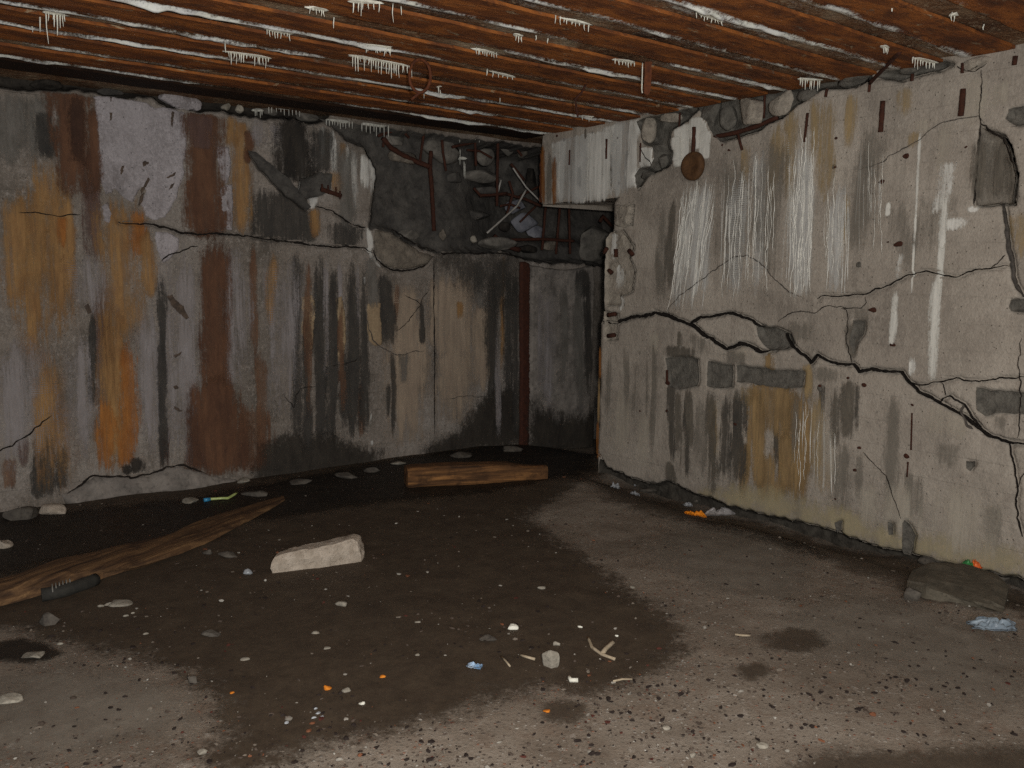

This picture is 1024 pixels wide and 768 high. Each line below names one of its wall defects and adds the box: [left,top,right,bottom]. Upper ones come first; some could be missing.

corrosion [45,92,157,468]
corrosion [182,112,275,475]
spalling [0,76,635,340]
crack [118,206,519,436]
leakage [0,0,654,203]
leakage [665,0,898,68]
spalling [635,61,964,189]
crack [603,203,1024,537]
corrosion [811,96,857,200]
crack [860,63,1017,204]
spalling [975,127,1019,206]
leakage [0,250,1024,768]